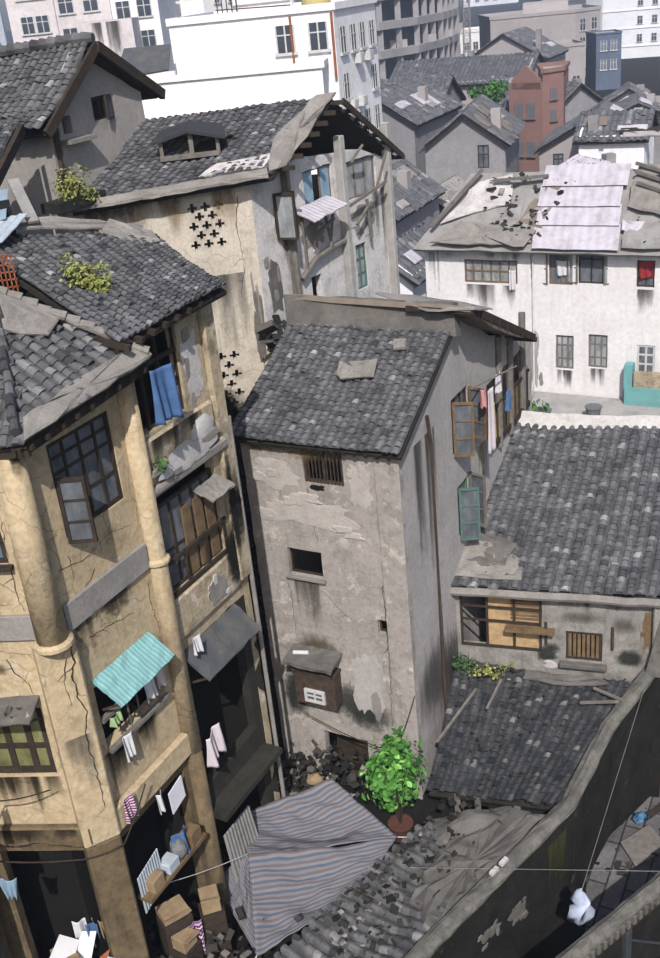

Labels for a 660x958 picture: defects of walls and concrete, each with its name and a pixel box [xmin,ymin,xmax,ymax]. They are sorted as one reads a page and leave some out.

crack [234,196,245,295]
peeling [179,326,204,410]
spalling [152,426,221,495]
peeling [252,457,372,540]
crack [0,519,25,614]
crack [0,651,34,695]
crack [57,582,162,806]
leakage [286,676,305,708]
leakage [303,637,332,650]
leakage [341,688,386,725]
leakage [0,776,58,791]
spalling [477,896,529,952]